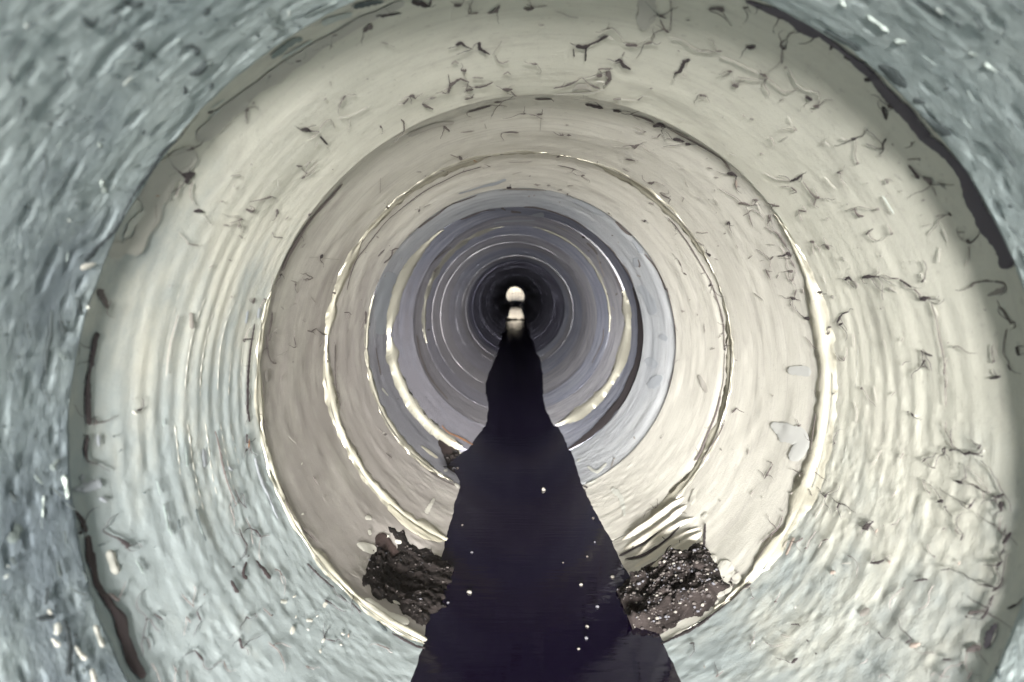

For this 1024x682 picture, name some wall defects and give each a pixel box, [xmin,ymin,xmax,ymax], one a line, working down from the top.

spalling [357,515,402,558]
peeling [710,555,742,606]
peeling [365,598,409,625]